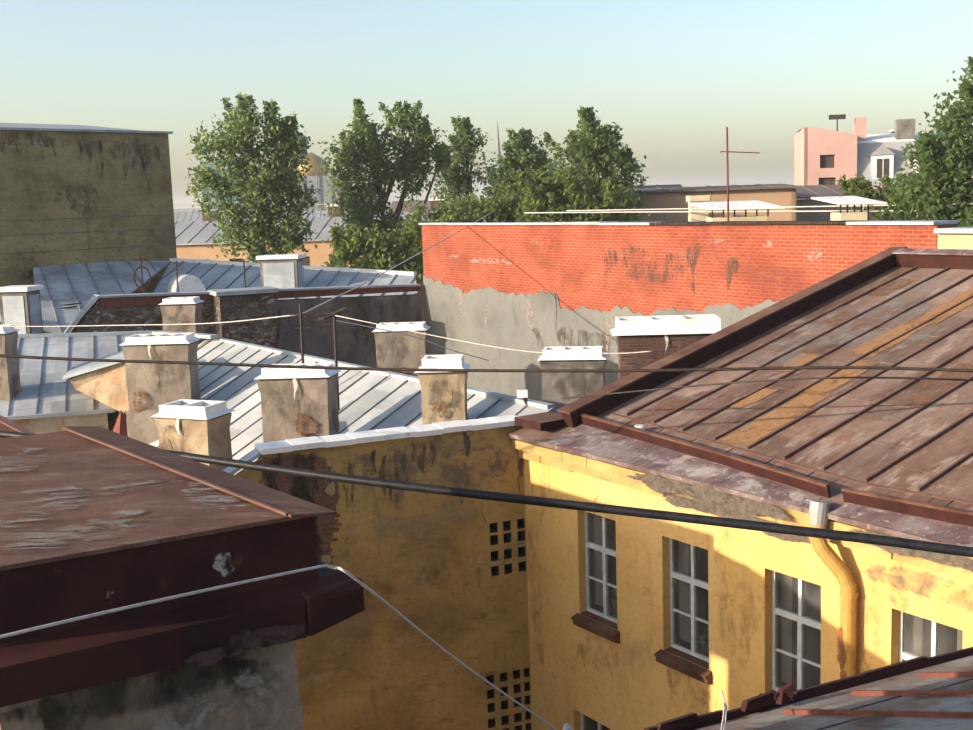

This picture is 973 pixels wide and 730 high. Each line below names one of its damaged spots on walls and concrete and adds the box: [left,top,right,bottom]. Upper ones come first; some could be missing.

damp [606,247,699,294]
peeling [423,275,780,401]
peeling [0,487,144,548]
peeling [183,483,245,509]
flaking render [257,452,342,564]
damp [365,431,476,502]
spalling [643,473,811,544]
peeling [213,553,234,577]
rust [837,627,845,679]